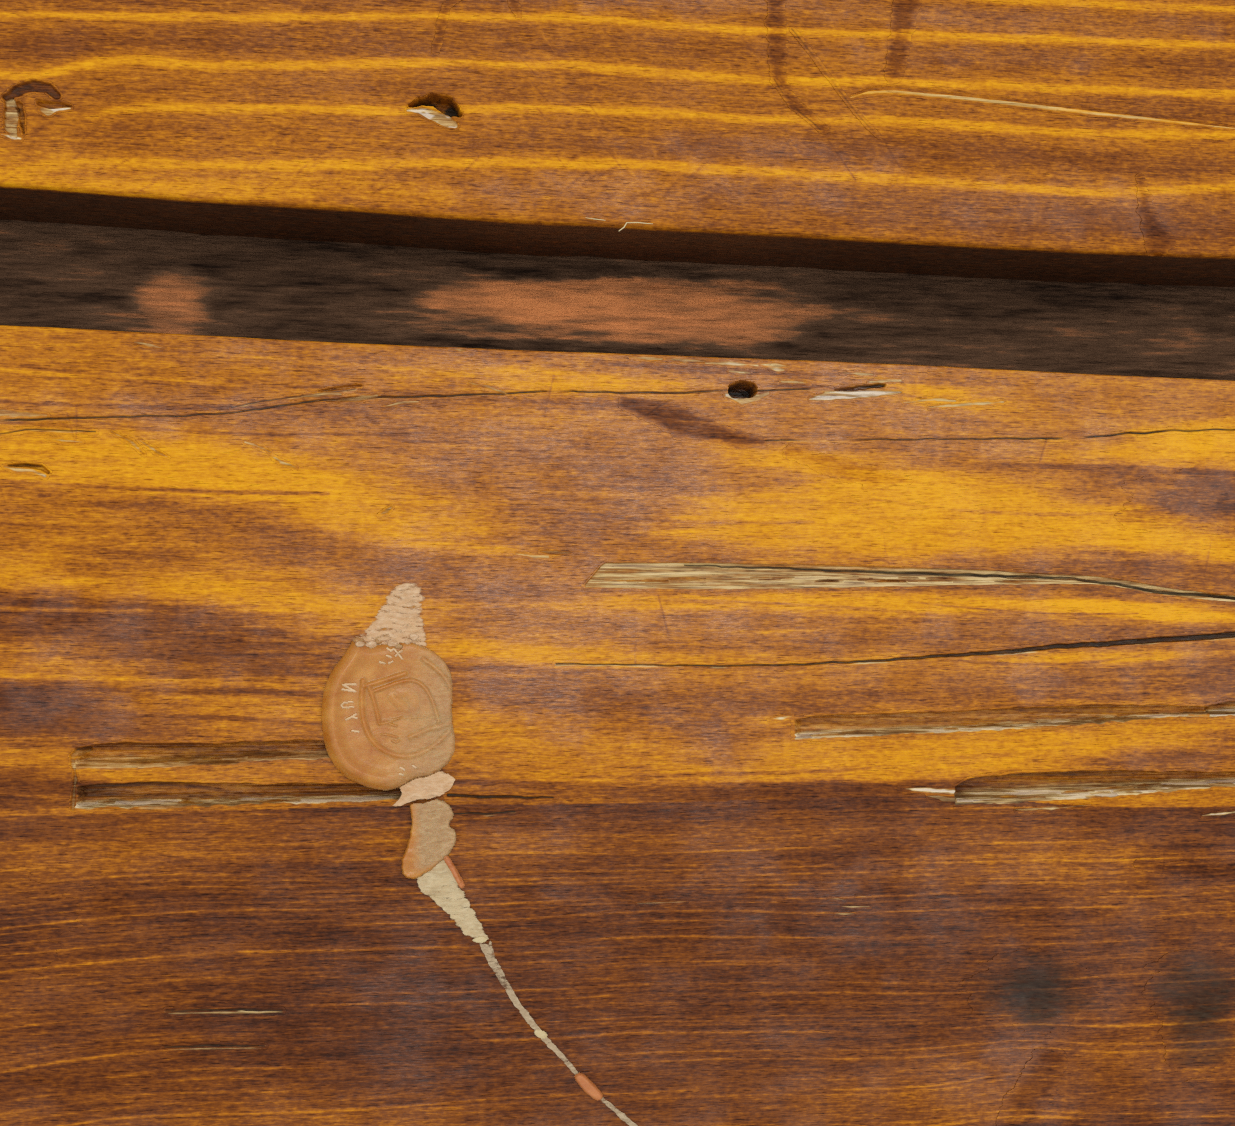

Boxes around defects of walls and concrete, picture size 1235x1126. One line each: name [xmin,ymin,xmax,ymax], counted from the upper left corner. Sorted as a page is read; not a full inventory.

crack [552,628,1235,671]
peeling [574,1072,603,1101]